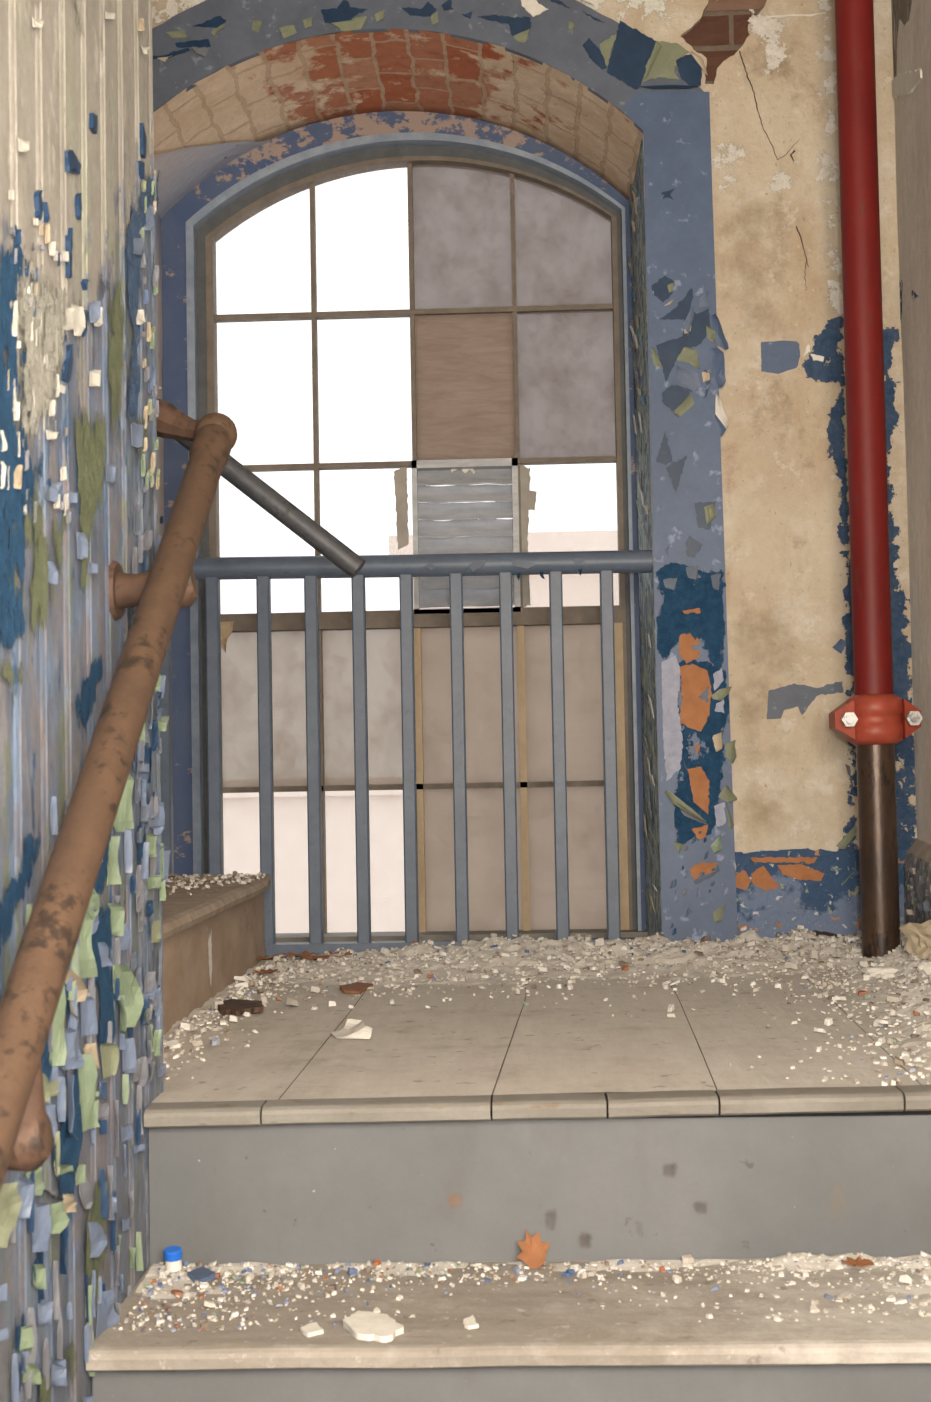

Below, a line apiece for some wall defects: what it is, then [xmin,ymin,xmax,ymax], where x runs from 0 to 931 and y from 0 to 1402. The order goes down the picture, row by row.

peeling [89,113,98,134]
peeling [137,0,227,62]
crack [739,51,799,162]
peeling [0,123,164,707]
peeling [627,254,729,437]
peeling [761,316,854,719]
peeling [883,281,917,703]
peeling [76,654,103,728]
peeling [638,501,824,936]
peeling [836,741,859,885]
peeling [895,735,917,850]
peeling [0,675,171,1402]